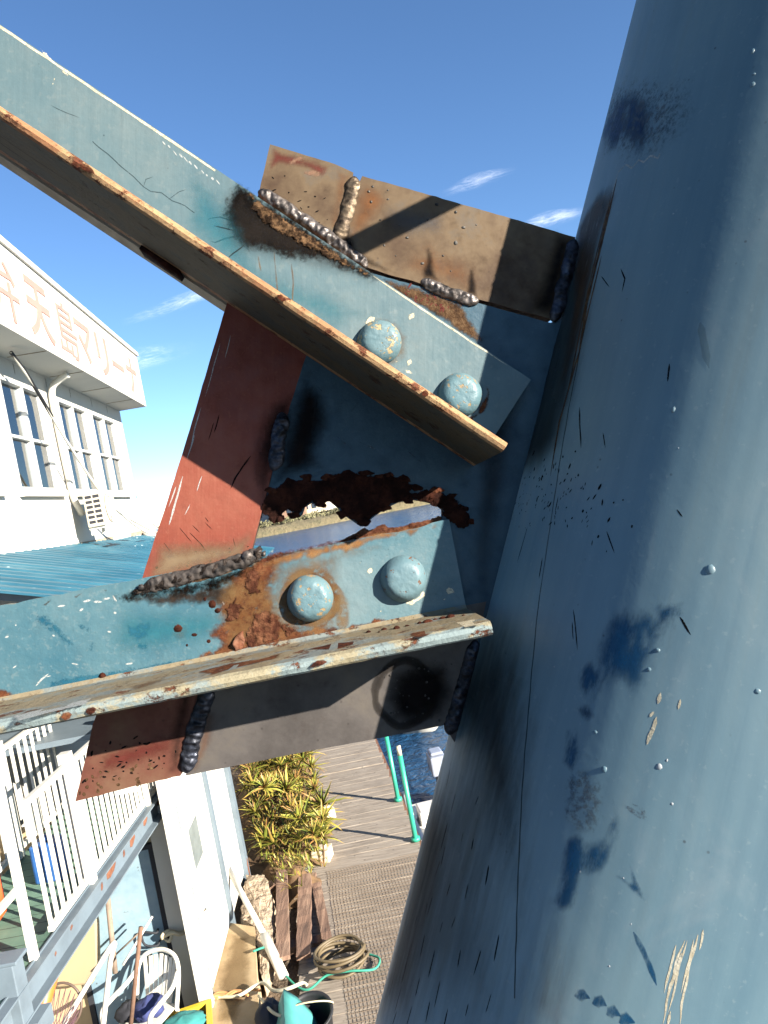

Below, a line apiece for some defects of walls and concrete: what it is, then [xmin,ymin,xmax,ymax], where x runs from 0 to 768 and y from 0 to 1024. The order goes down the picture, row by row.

crack [93,142,195,213]
corrosion [136,470,474,674]